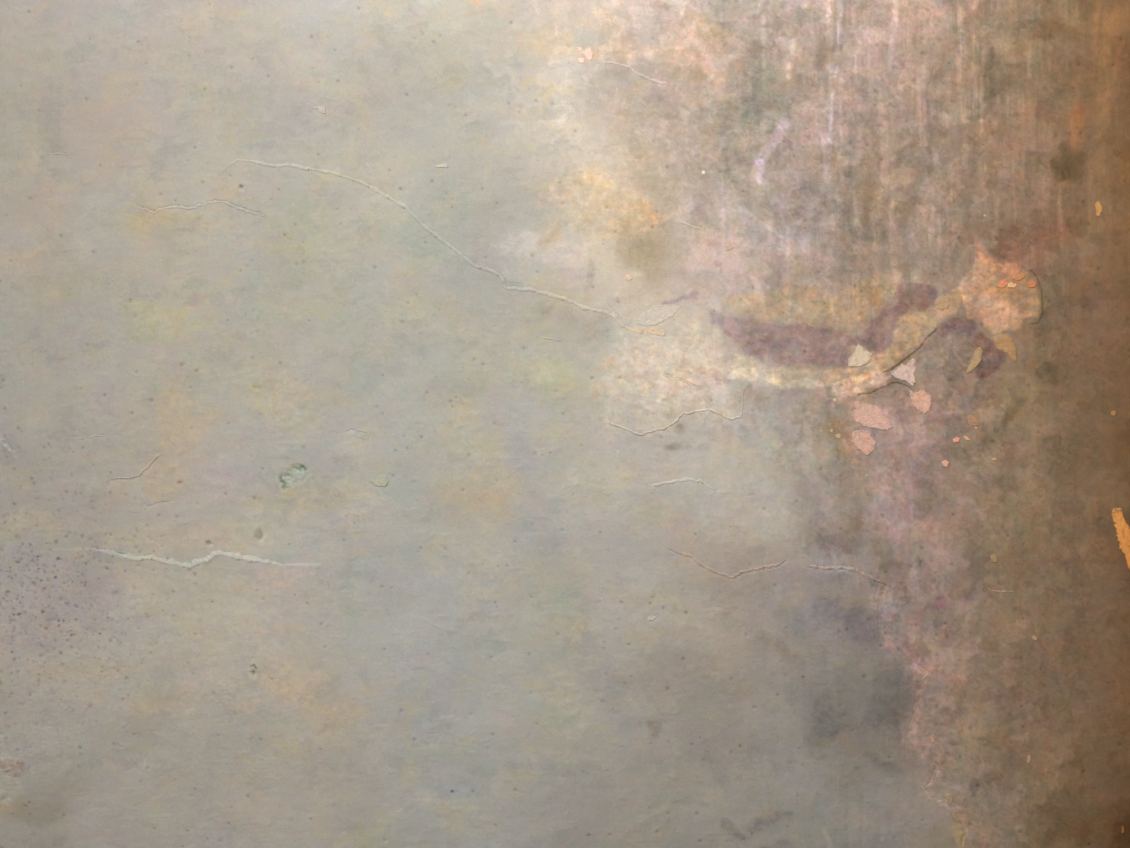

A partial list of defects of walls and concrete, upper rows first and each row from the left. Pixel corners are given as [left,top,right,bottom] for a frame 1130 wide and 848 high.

leakage [502,0,807,204]
crack [133,158,663,339]
leakage [484,161,674,351]
leakage [983,210,1082,285]
leakage [660,270,941,367]
peeling [848,343,873,367]
peeling [851,401,893,456]
peeling [890,359,932,414]
flaking render [957,240,1048,384]
leakage [685,474,818,552]
peeling [1111,508,1130,570]
leakage [752,392,1037,848]